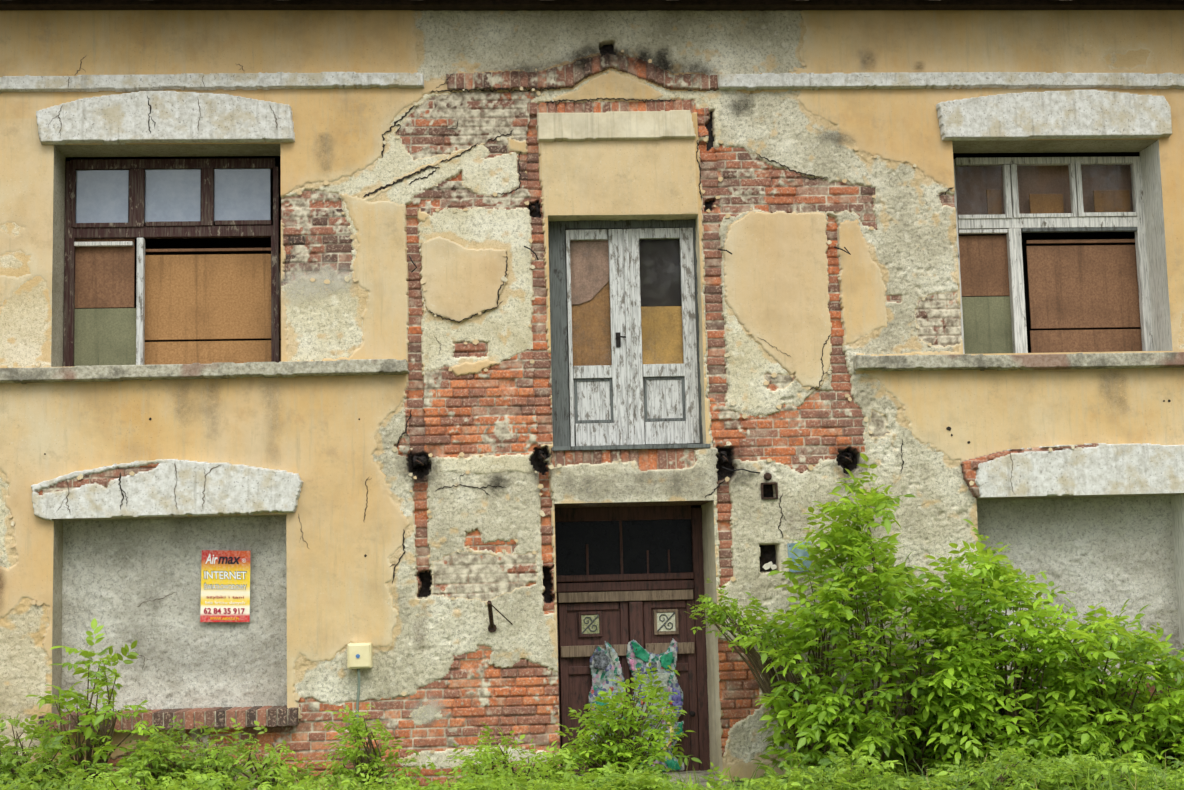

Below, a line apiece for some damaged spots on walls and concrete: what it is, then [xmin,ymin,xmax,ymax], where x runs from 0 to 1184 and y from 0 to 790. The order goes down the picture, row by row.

crack [363,73,676,197]
peeling [0,469,17,570]
crack [118,472,127,510]
crack [174,464,219,507]
peeling [93,10,807,790]
crack [436,470,506,495]
peeling [697,90,1099,764]
peeling [0,598,52,774]